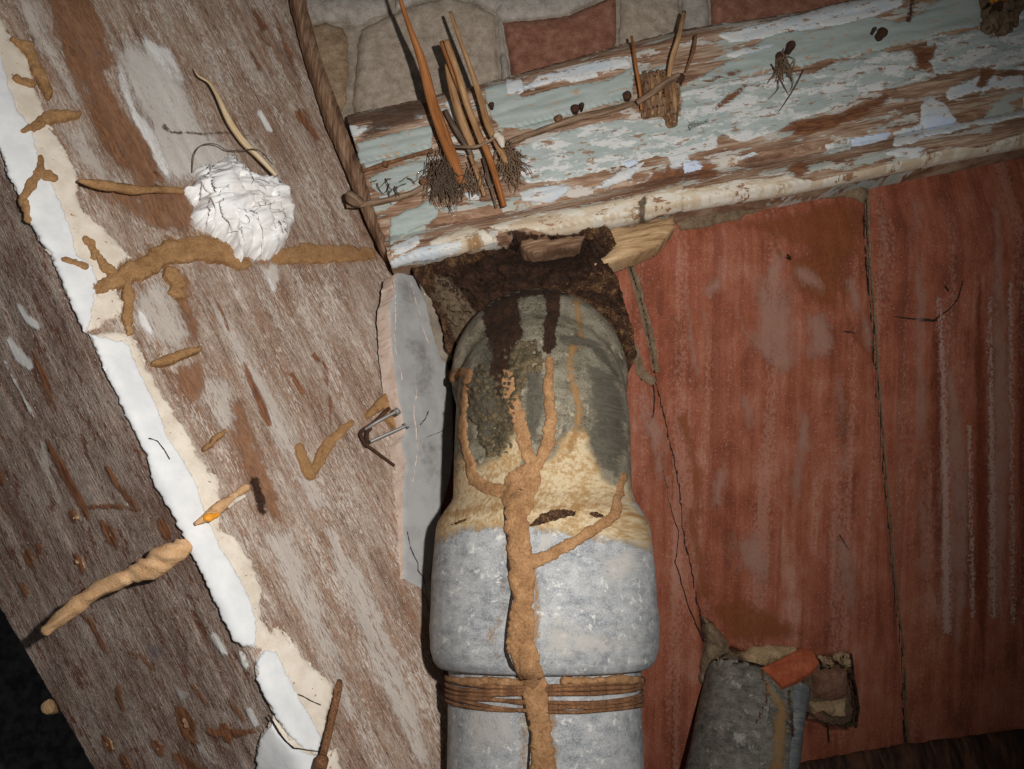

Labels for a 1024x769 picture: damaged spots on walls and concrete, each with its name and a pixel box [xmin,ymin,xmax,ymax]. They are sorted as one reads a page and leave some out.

peeling [349,115,433,199]
peeling [389,0,1024,269]
leakage [428,230,654,555]
crack [640,371,704,641]
spalling [801,651,860,730]